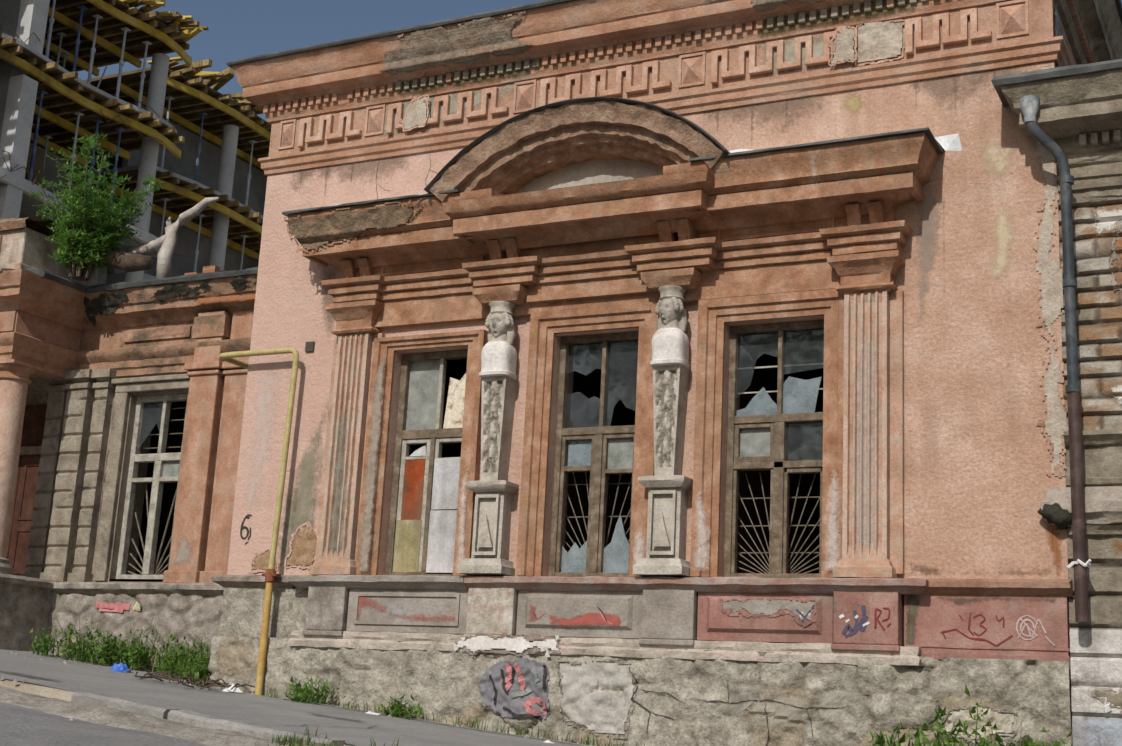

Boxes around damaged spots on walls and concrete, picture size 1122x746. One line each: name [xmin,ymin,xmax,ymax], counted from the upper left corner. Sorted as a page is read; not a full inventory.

flaking render [1109,229,1122,291]
flaking render [197,293,255,306]
flaking render [1030,137,1067,478]
water stain [281,421,347,558]
spalling [248,521,317,575]
crack [630,671,851,745]